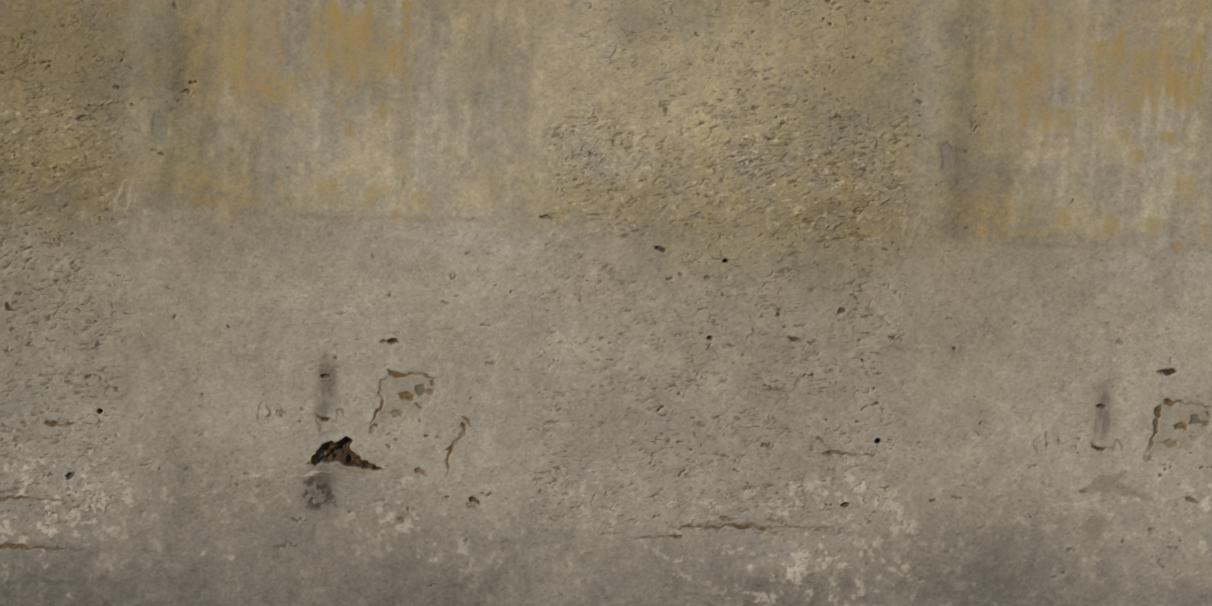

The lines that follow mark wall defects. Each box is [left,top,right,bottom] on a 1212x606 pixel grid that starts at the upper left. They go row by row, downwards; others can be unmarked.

spalling [368,367,442,437]
spalling [1142,397,1212,464]
spalling [305,436,387,476]
crack [0,494,68,505]
crack [0,542,87,553]
crack [627,519,845,541]